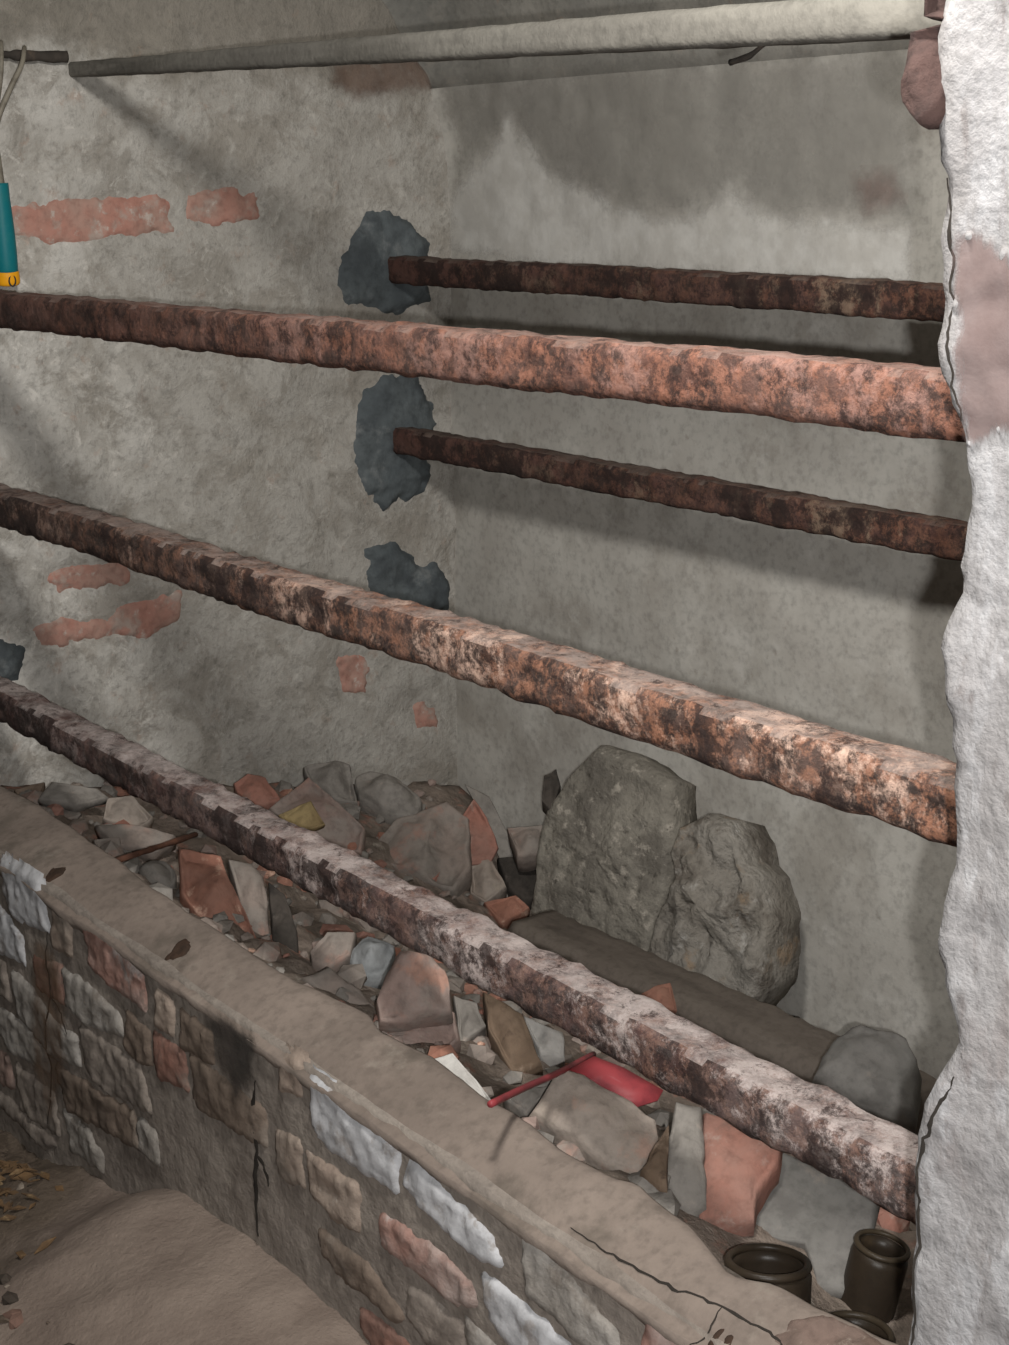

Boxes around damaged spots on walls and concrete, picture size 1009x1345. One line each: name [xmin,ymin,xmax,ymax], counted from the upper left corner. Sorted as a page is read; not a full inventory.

rust [0,290,966,442]
rust [388,255,946,322]
rust [393,427,968,561]
rust [0,483,957,847]
rust [0,676,918,1225]
crack [251,1081,269,1236]